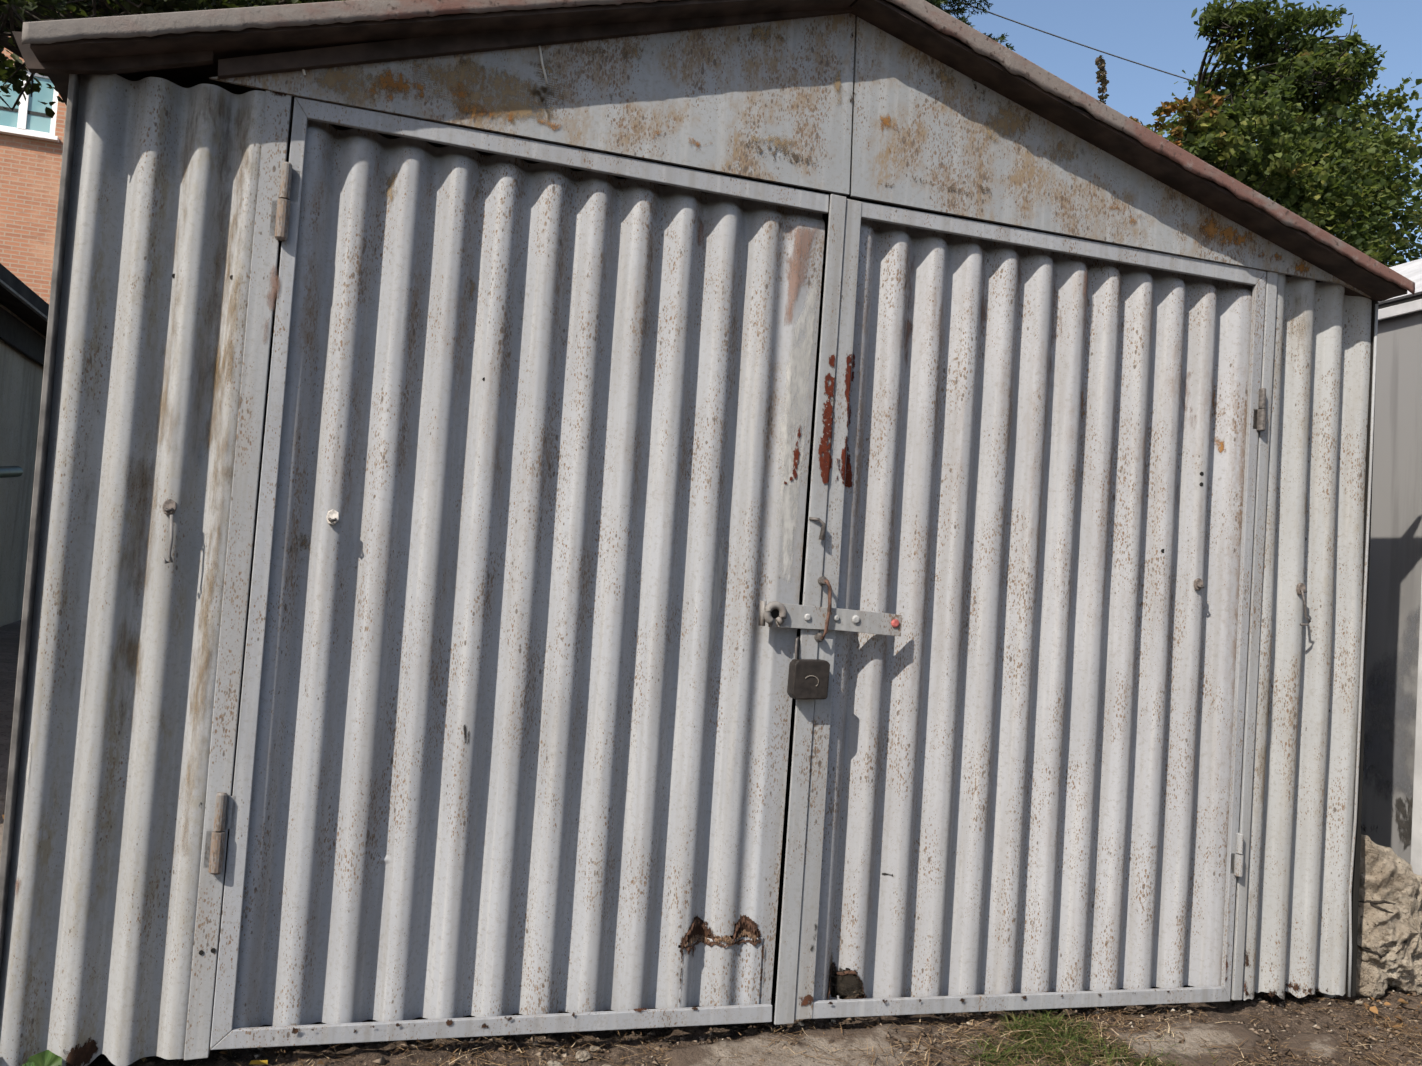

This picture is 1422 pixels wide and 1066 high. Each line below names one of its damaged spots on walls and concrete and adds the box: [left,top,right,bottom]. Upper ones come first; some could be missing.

corrosion [314,58,566,130]
corrosion [1200,214,1309,274]
corrosion [63,1038,98,1066]